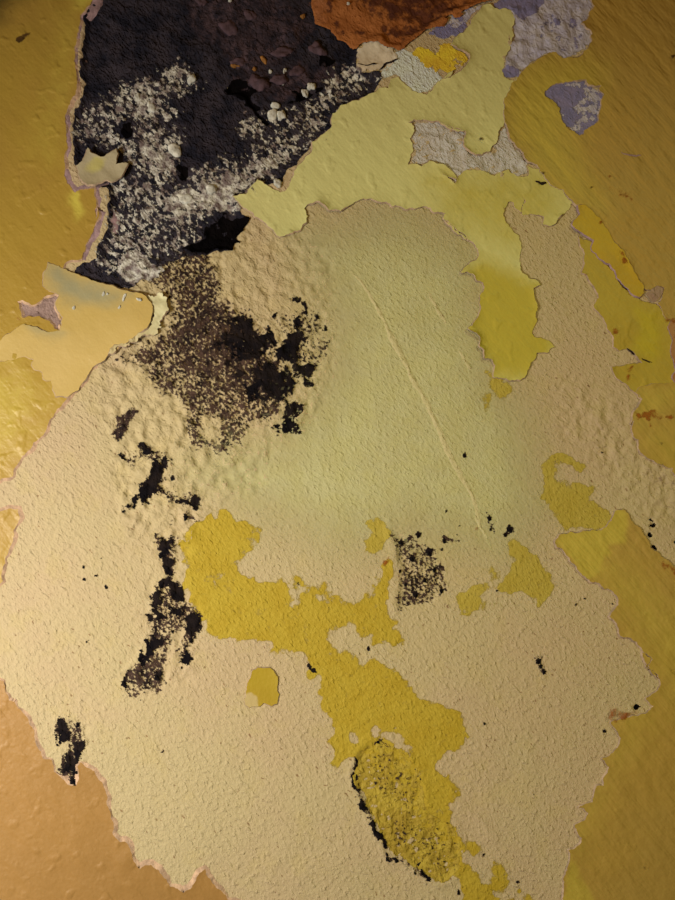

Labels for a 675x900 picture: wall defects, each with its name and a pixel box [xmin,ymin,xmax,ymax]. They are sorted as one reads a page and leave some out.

flaking render [504,0,592,78]
spalling [65,0,492,289]
flaking render [412,122,527,183]
flaking render [560,82,603,131]
peeling [578,237,675,400]
leakage [111,230,554,900]
peeling [244,666,280,708]
leakage [54,716,85,785]